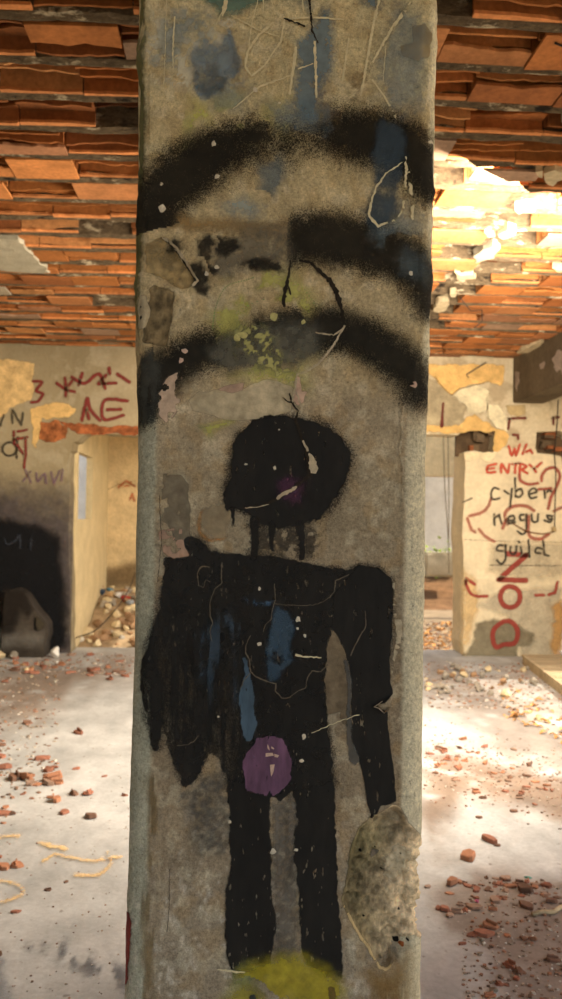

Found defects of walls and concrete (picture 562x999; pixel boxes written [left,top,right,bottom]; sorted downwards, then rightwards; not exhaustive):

flaking render [0,235,50,273]
flaking render [0,359,138,448]
flaking render [410,362,526,462]
spalling [536,432,562,458]